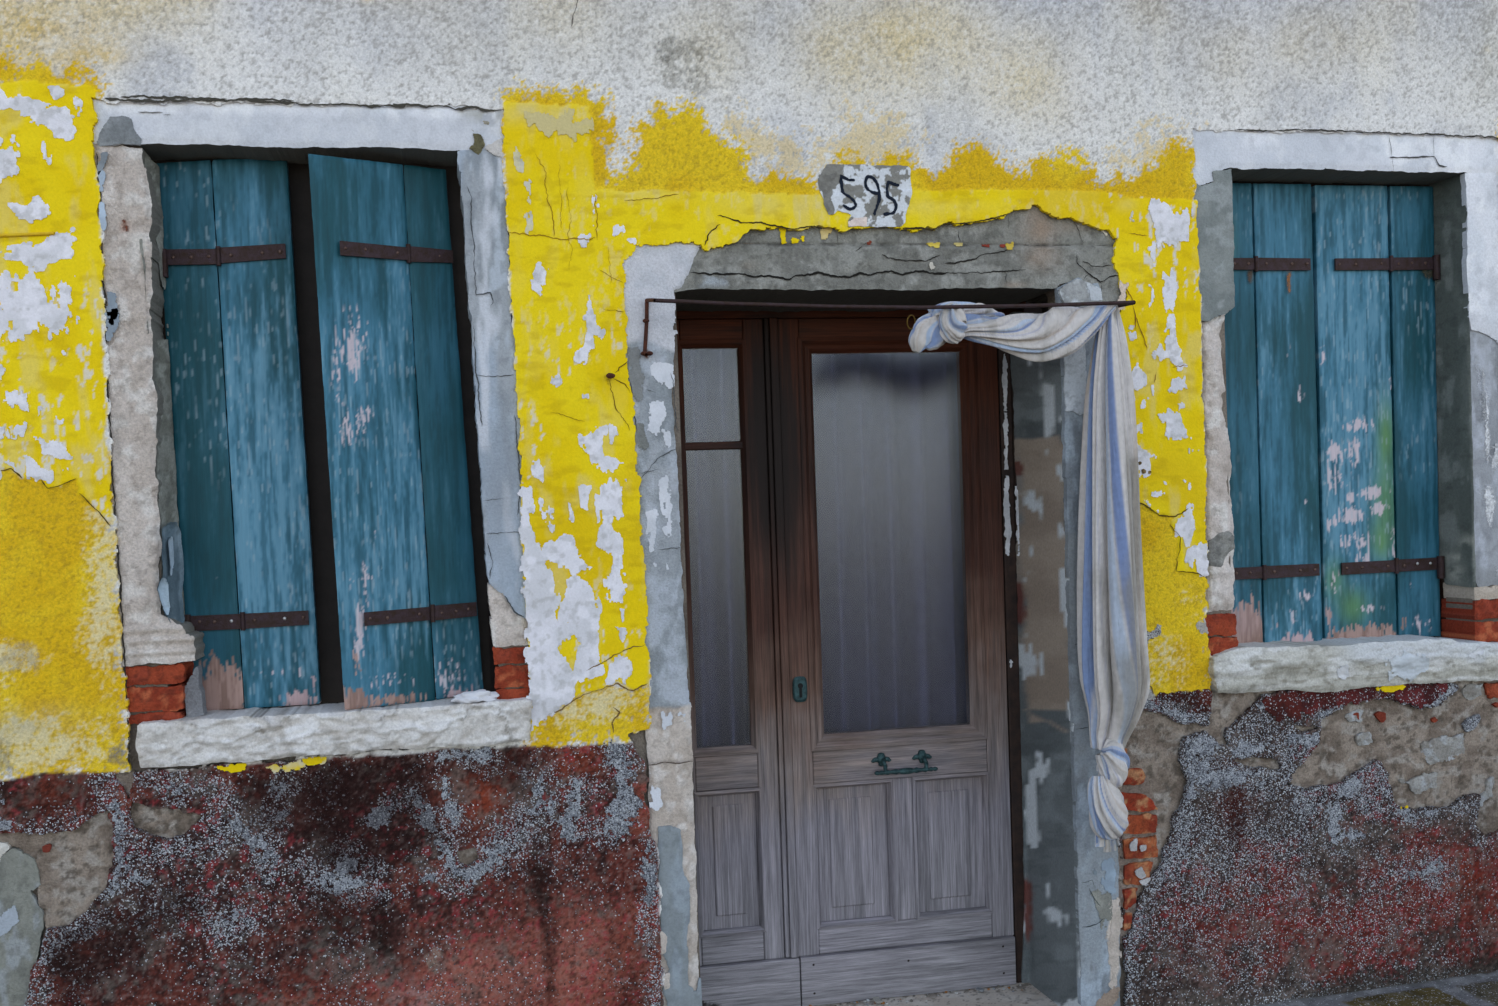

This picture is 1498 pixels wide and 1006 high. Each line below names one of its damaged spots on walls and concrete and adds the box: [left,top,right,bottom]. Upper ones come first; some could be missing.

peeling [0,134,20,184]
peeling [0,85,83,165]
spalling [97,116,142,231]
spalling [469,121,533,235]
peeling [0,364,73,484]
peeling [0,195,80,355]
peeling [530,262,549,296]
peeling [573,295,606,365]
peeling [1129,198,1235,577]
peeling [517,347,675,731]
spalling [0,770,201,1006]
spalling [1091,650,1498,1006]